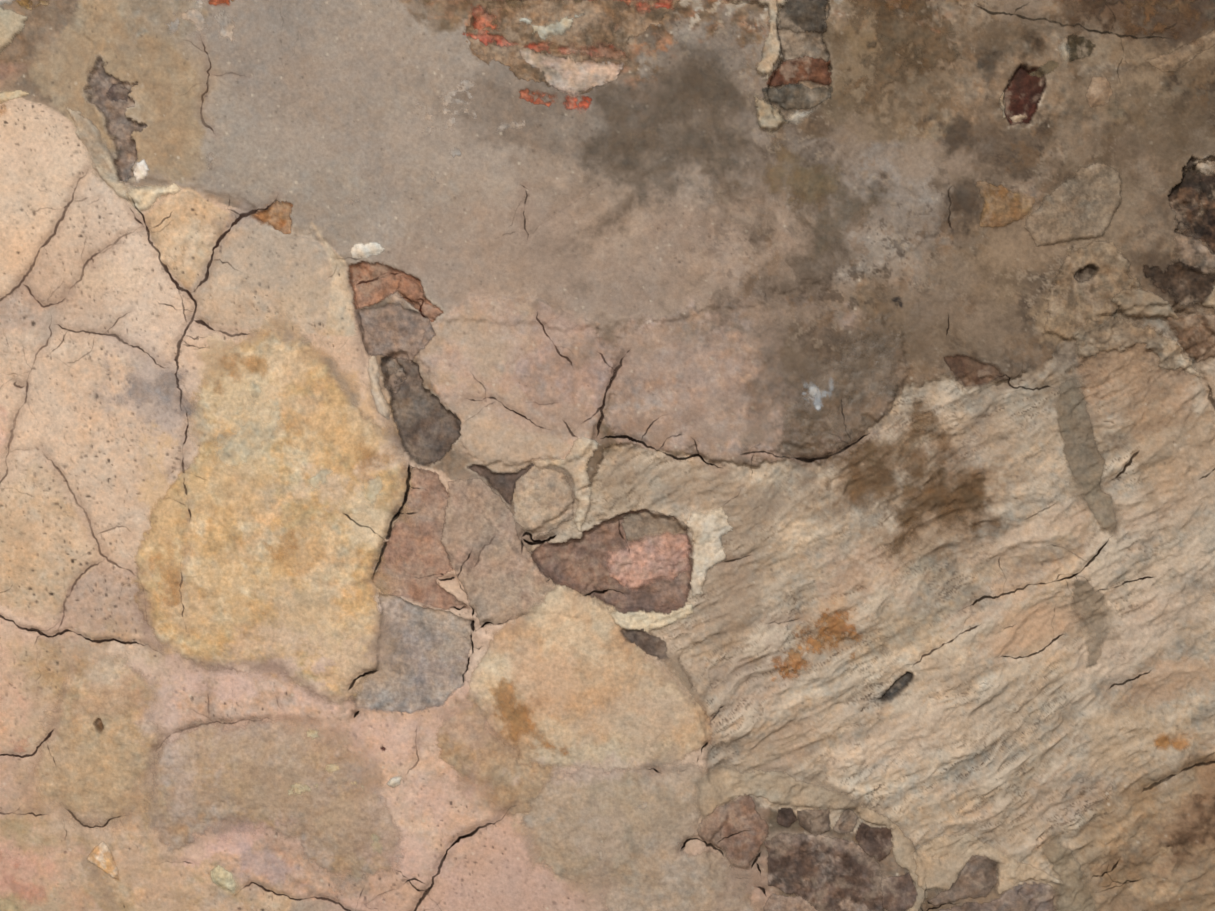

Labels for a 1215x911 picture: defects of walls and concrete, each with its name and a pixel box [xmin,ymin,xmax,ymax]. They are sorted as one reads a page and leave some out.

peeling [463,0,680,110]
peeling [731,0,833,131]
leakage [847,0,960,111]
leakage [1066,0,1199,38]
crack [0,201,270,517]
crack [565,353,866,468]
leakage [810,386,827,410]
crack [374,465,414,573]
crack [521,532,556,550]
crack [0,615,139,644]
crack [439,554,501,682]
crack [406,823,495,911]